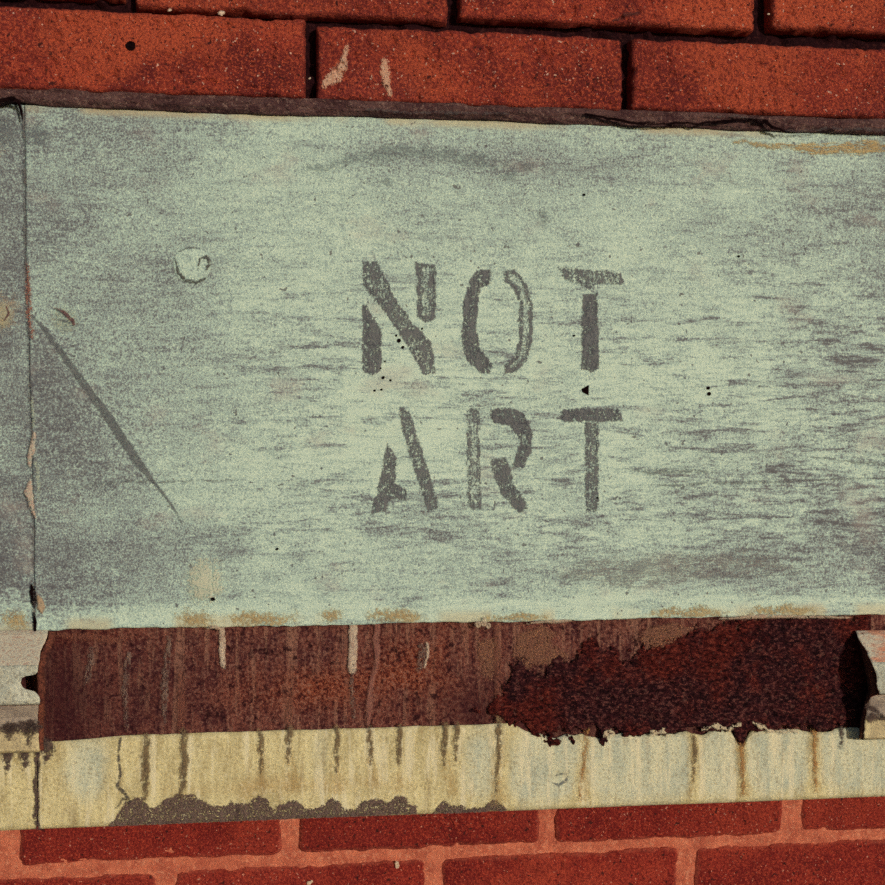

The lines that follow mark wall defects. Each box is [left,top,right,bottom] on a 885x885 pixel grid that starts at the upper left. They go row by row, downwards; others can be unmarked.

rust [21,676,31,690]
rust [43,604,885,800]
leakage [0,718,56,830]
leakage [140,733,152,800]
leakage [179,728,190,797]
leakage [257,728,265,772]
leakage [285,725,294,762]